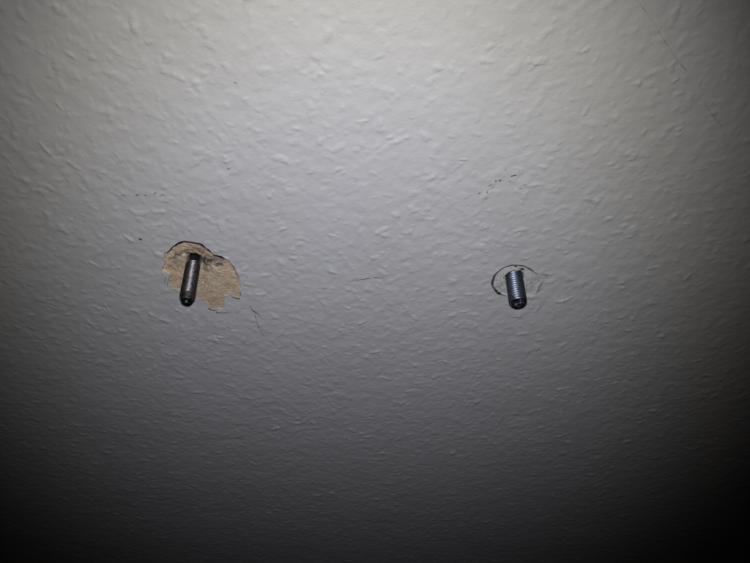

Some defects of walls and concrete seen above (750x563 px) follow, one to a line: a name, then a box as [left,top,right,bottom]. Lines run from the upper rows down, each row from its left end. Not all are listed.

flaking render [161,241,242,313]